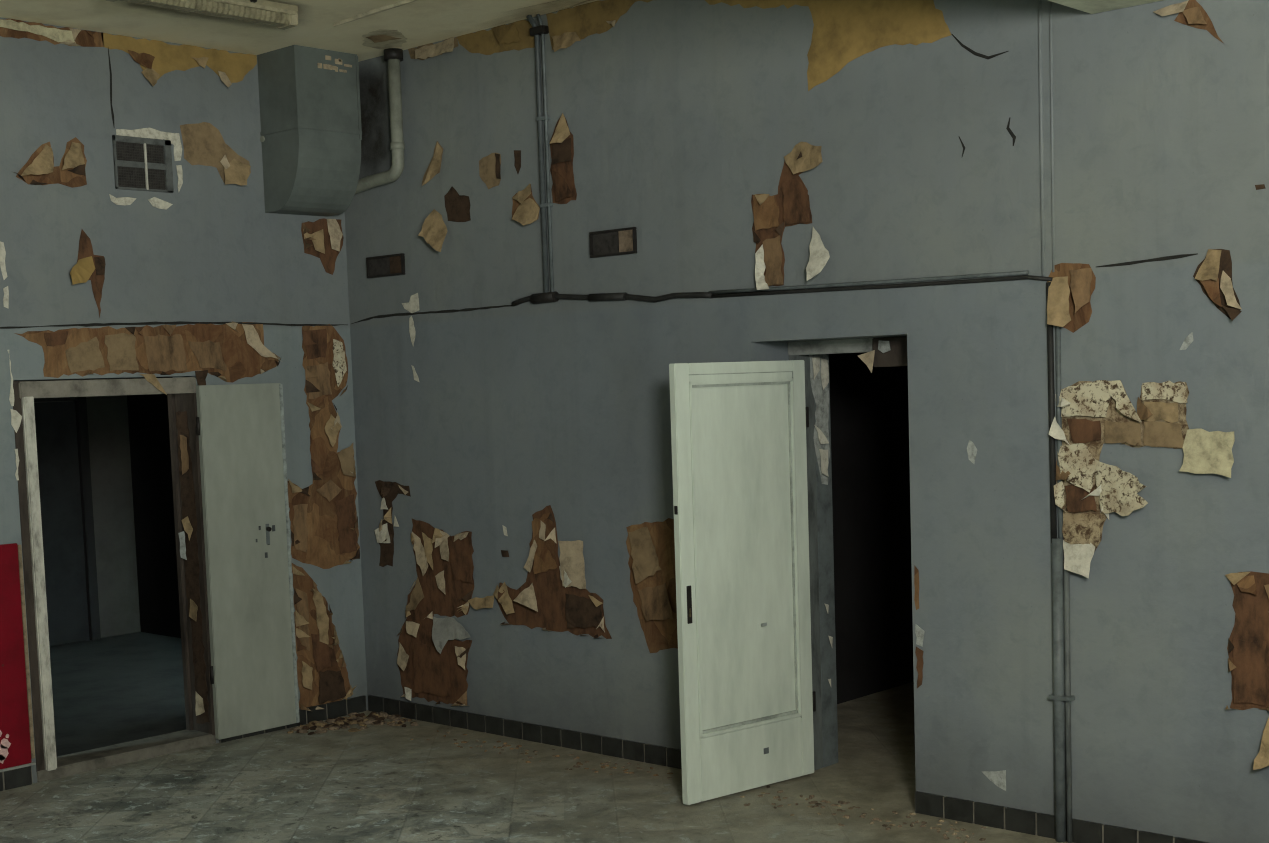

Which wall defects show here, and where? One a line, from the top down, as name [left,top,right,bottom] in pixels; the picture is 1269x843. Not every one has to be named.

peeling [705,0,951,91]
crack [951,34,1008,59]
peeling [15,229,282,395]
peeling [109,122,251,209]
peeling [751,142,830,290]
peeling [1047,263,1096,333]
peeling [1193,249,1242,321]
peeling [287,324,360,711]
peeling [374,480,612,706]
peeling [626,518,678,653]
peeling [1049,380,1235,579]
peeling [1225,571,1269,770]